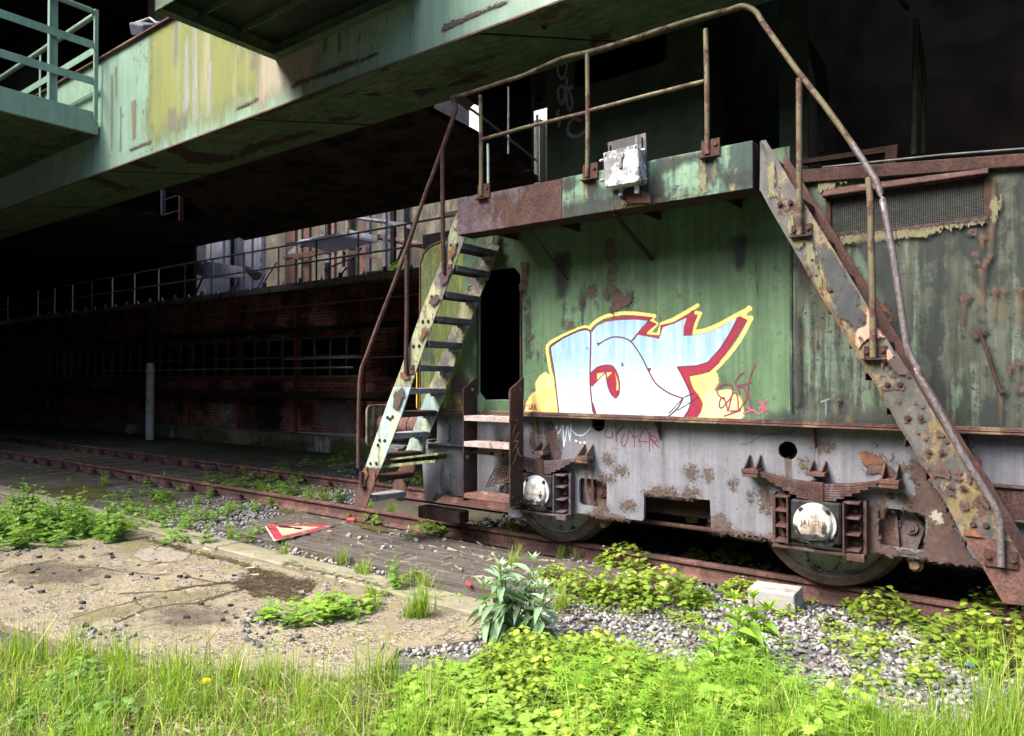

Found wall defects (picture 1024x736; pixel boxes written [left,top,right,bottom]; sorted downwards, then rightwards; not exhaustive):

corrosion [0,0,565,211]